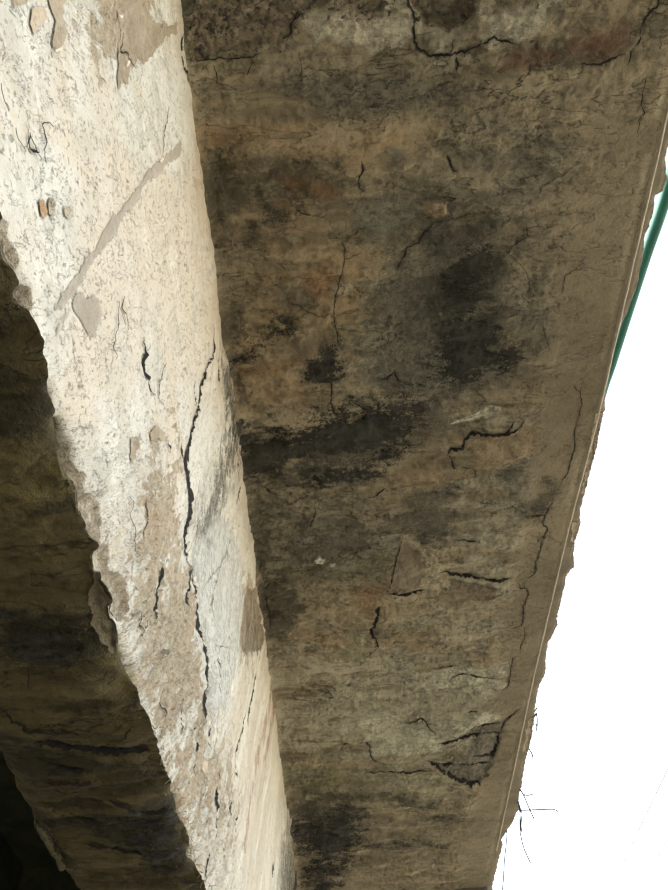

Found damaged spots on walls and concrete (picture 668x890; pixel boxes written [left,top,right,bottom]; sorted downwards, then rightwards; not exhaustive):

peeling [13,0,66,53]
spalling [114,0,391,89]
spalling [410,0,476,33]
crack [393,0,513,71]
water stain [427,245,524,386]
water stain [197,315,465,550]
water stain [450,405,501,424]
crack [139,329,232,776]
crack [437,380,584,691]
crack [340,708,521,789]
spalling [434,732,502,783]
water stain [280,803,444,890]